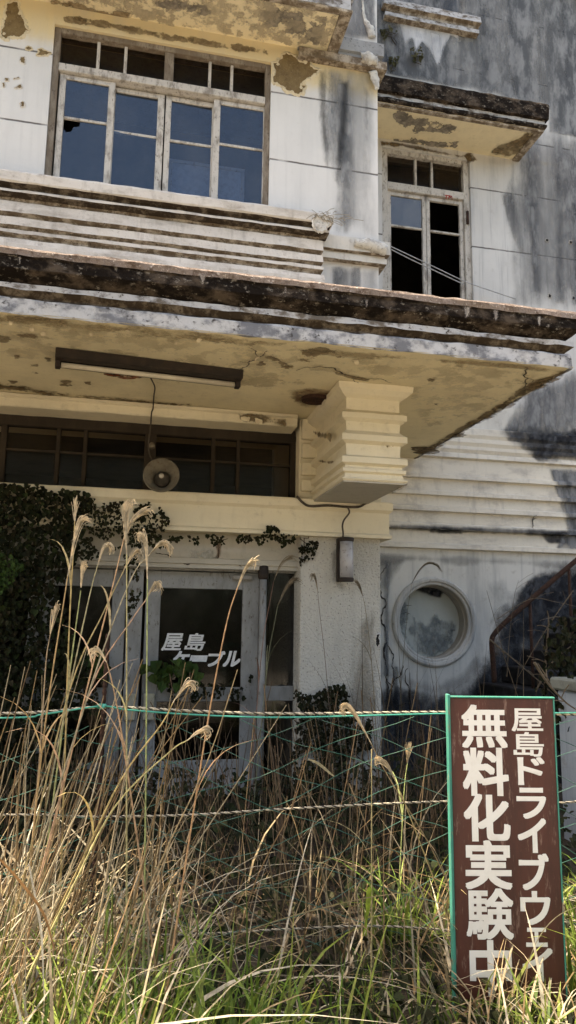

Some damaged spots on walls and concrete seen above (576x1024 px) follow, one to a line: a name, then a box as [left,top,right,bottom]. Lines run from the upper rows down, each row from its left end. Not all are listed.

spalling [0,0,52,109]
peeling [51,0,336,97]
damp [323,74,355,225]
peeling [381,110,476,162]
damp [334,268,359,287]
damp [390,375,576,549]
damp [354,563,576,772]